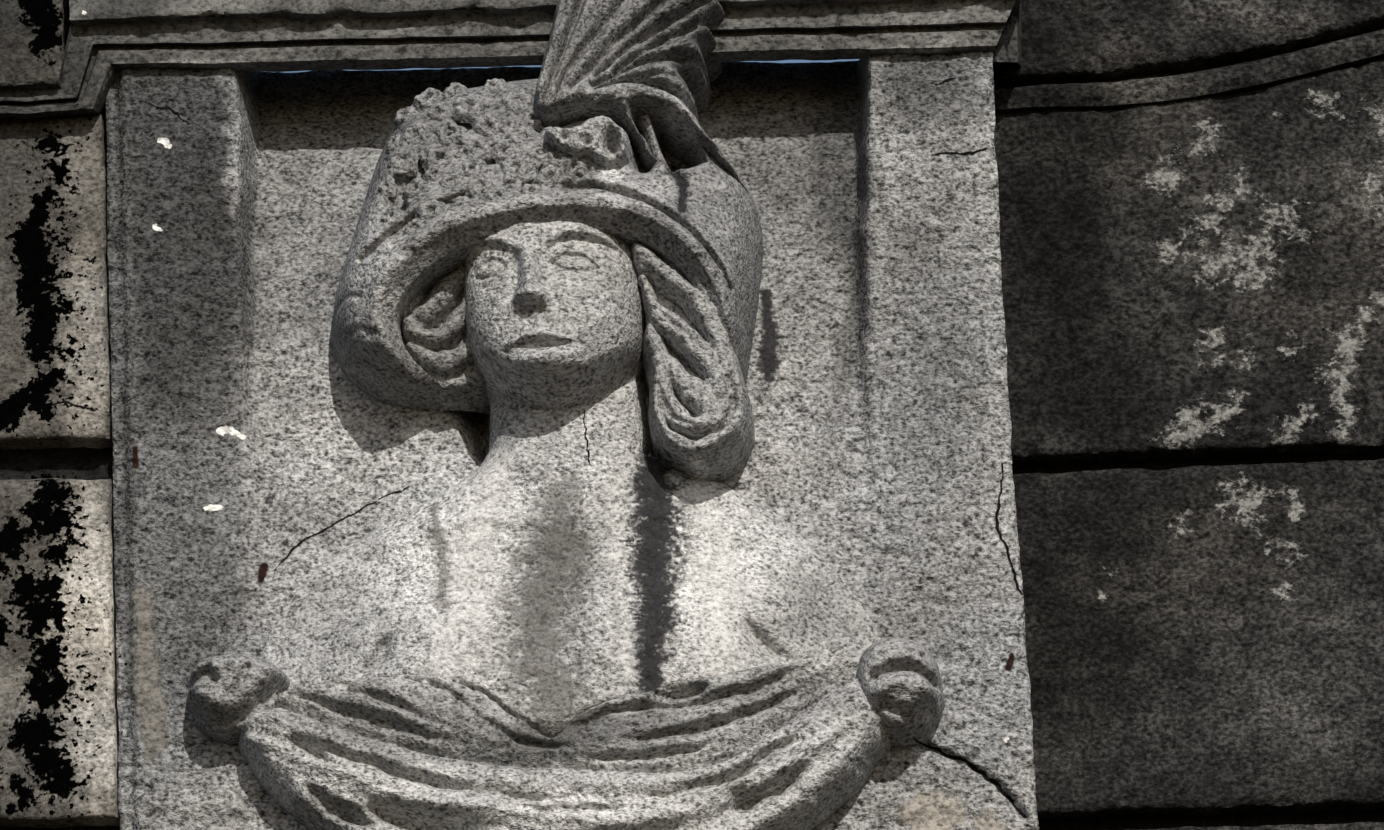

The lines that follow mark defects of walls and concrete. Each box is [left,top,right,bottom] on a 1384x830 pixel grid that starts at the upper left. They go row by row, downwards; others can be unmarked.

damp [18,0,64,65]
damp [1146,168,1180,190]
damp [1161,174,1307,289]
damp [0,97,117,453]
damp [1203,327,1224,367]
damp [1324,297,1384,439]
damp [1167,391,1242,449]
damp [1273,405,1317,453]
crack [274,486,410,572]
damp [608,443,743,693]
damp [0,467,131,827]
crack [914,739,1026,818]